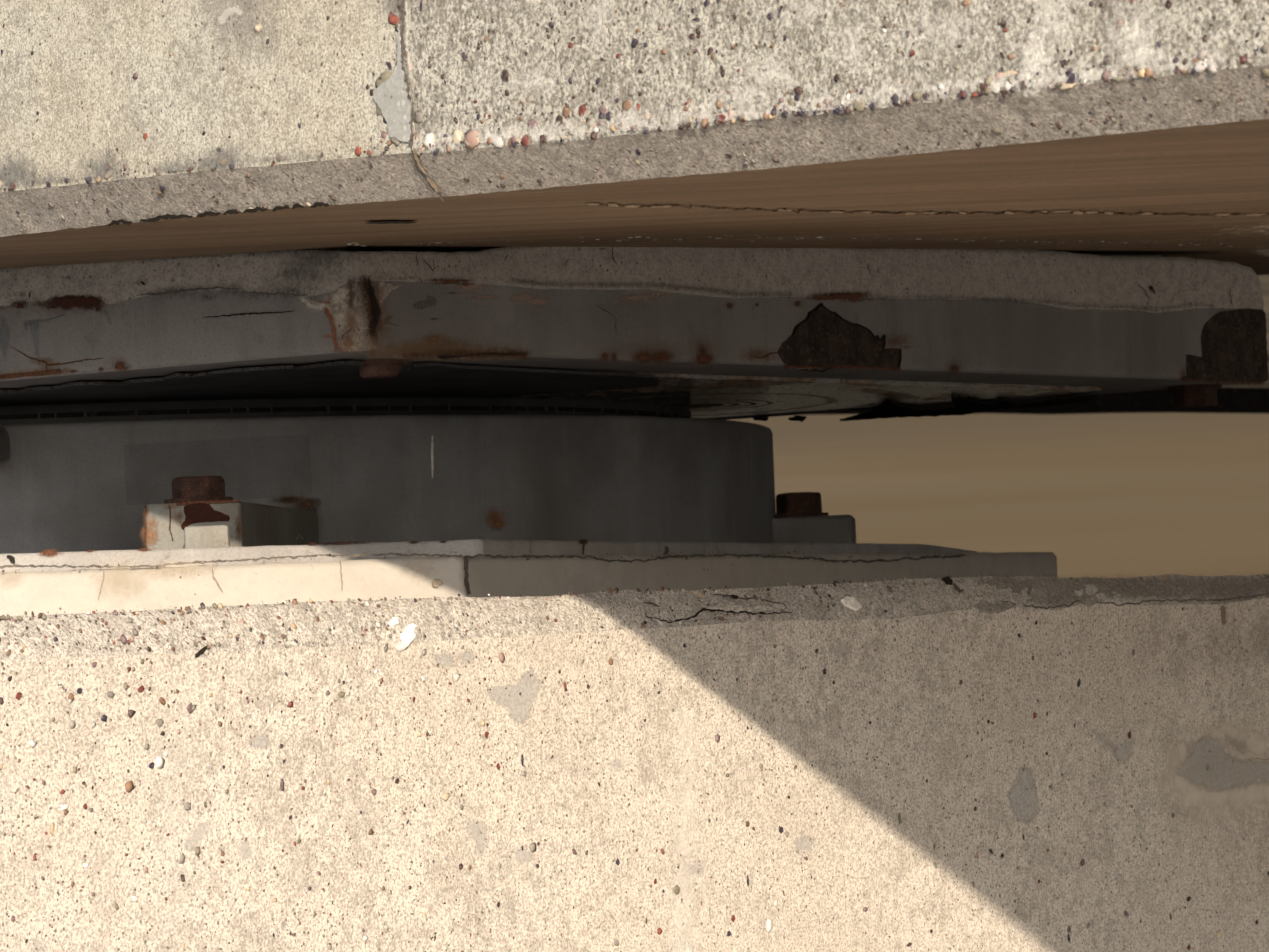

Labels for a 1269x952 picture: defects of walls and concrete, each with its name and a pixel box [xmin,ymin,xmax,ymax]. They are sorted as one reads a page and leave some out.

crack [400,0,415,146]
rust [0,295,102,312]
peeling [750,292,908,373]
rust [0,370,76,379]
crack [643,594,792,623]